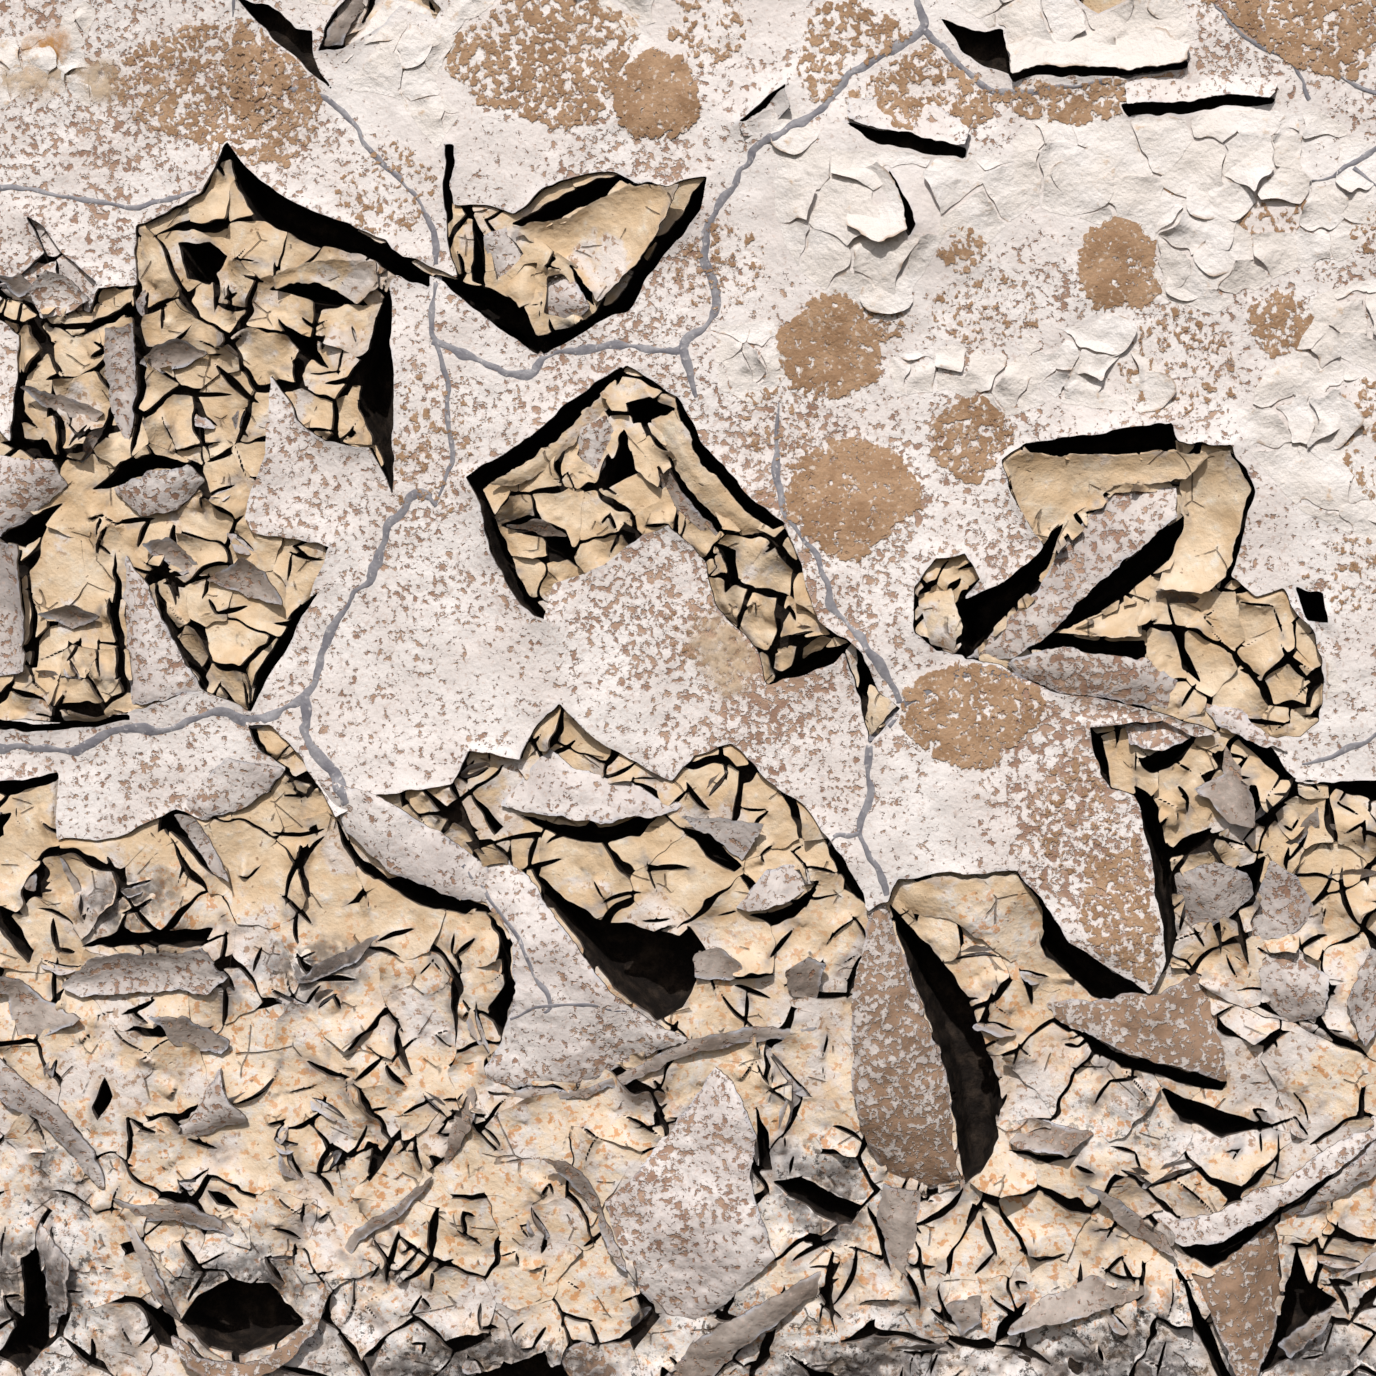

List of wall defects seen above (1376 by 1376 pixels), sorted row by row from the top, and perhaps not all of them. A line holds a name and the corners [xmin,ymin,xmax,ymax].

peeling [739,85,790,136]
crack [1213,2,1311,101]
crack [1338,74,1376,95]
crack [1311,146,1376,187]
crack [0,0,1188,806]
crack [771,402,1027,896]
crack [1302,732,1376,765]
peeling [0,277,1376,1376]